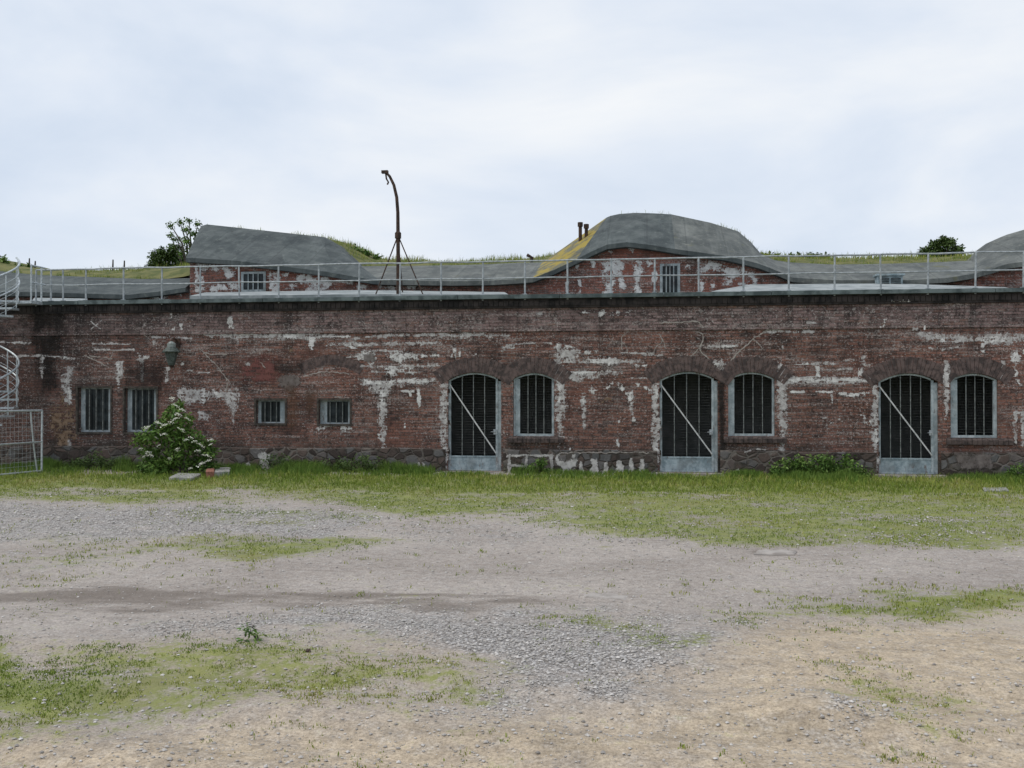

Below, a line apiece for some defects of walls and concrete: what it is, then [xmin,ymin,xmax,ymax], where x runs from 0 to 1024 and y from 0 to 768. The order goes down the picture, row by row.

peeling [194,267,238,293]
peeling [346,354,414,377]